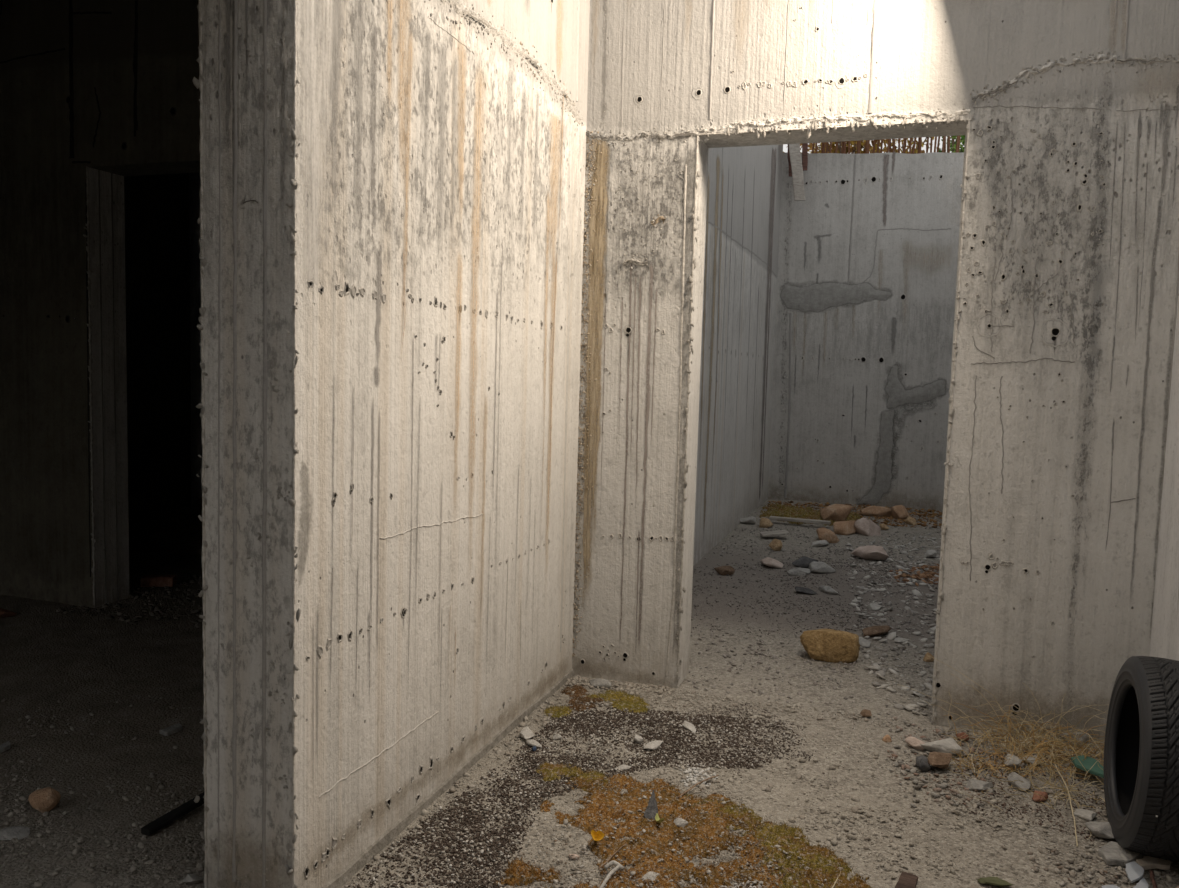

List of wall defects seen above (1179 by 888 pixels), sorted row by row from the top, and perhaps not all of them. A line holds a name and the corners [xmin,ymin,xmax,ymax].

leakage [303,0,340,278]
leakage [356,0,376,198]
leakage [356,409,380,677]
leakage [412,341,420,484]